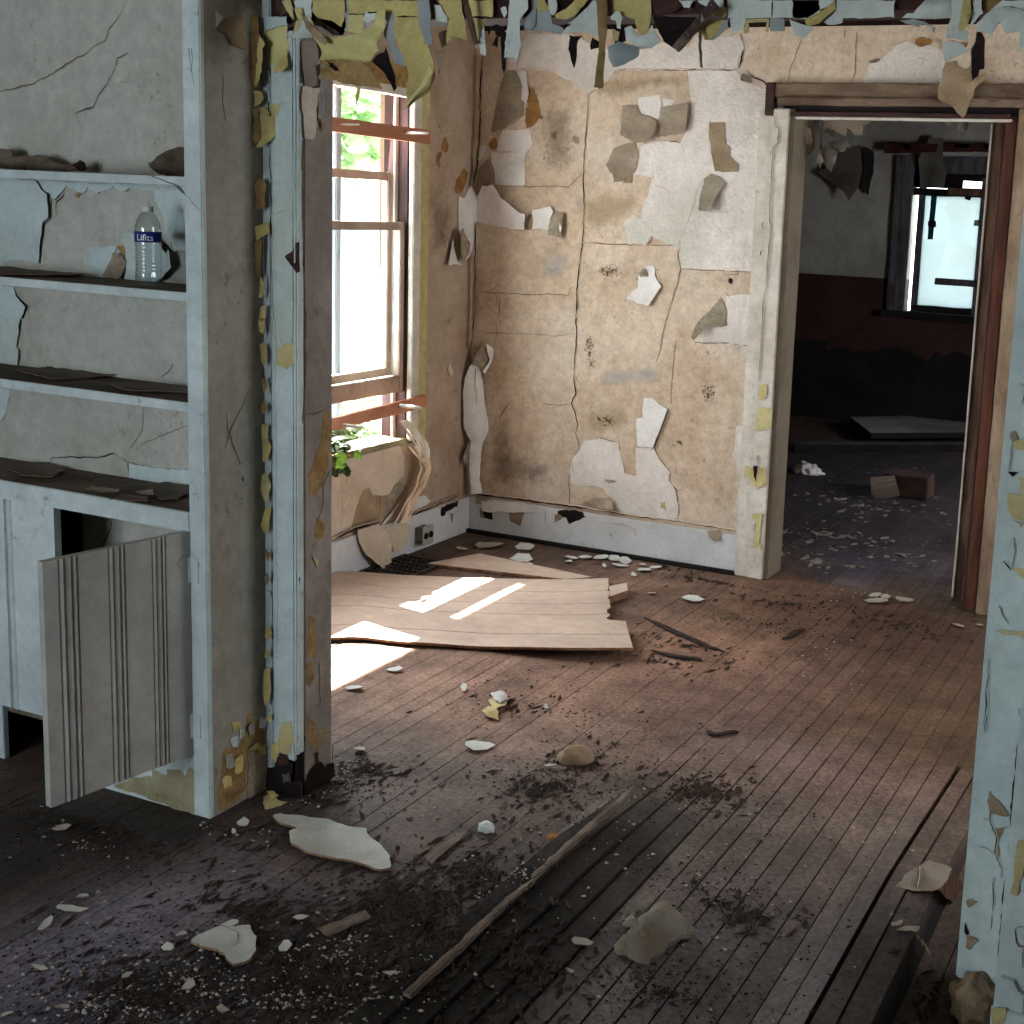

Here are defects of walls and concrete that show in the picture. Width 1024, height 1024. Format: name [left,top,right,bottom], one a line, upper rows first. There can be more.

crack [0,0,128,115]
crack [844,28,858,83]
peeling [251,0,1024,273]
peeling [0,178,188,393]
crack [408,33,802,533]
peeling [626,266,663,306]
peeling [691,293,750,345]
crack [332,480,380,540]
peeling [308,409,458,552]
peeling [554,398,678,524]
peeling [219,616,330,811]
peeling [977,791,1024,929]